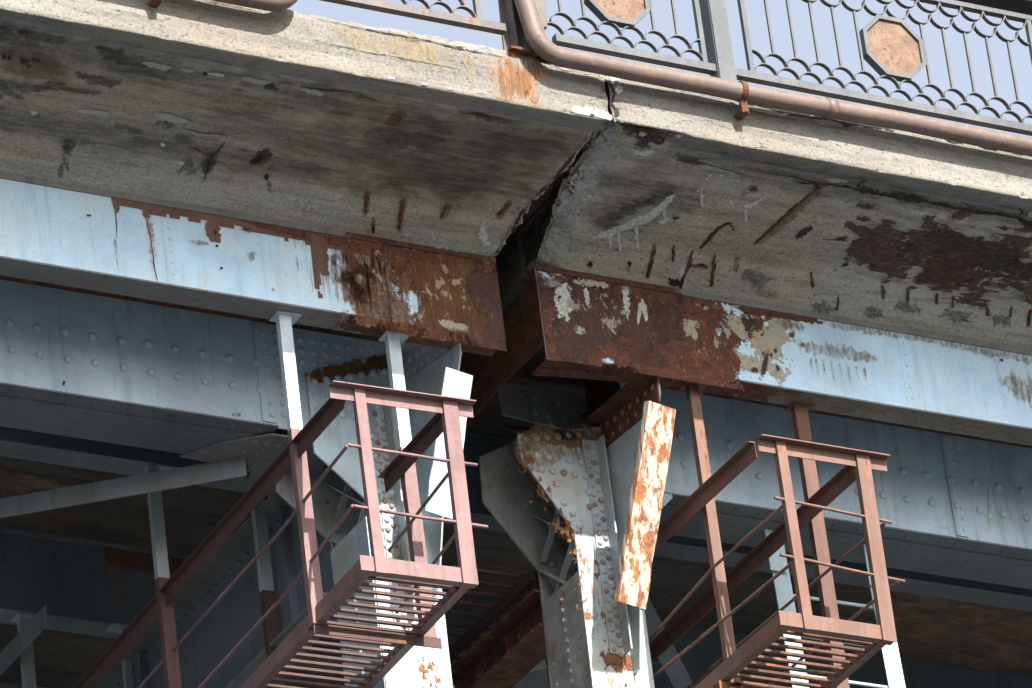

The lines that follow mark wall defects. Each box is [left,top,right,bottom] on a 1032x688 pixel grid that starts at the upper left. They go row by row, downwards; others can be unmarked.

water stain [0,72,121,99]
corrosion [494,50,548,105]
crack [600,75,623,117]
water stain [58,139,96,181]
water stain [405,221,501,253]
corrosion [111,197,507,356]
spalling [823,203,1032,327]
corrosion [304,354,388,383]
peeling [725,305,803,389]
corrosion [534,271,1032,444]
peeling [806,342,876,379]
corrosion [513,423,638,688]